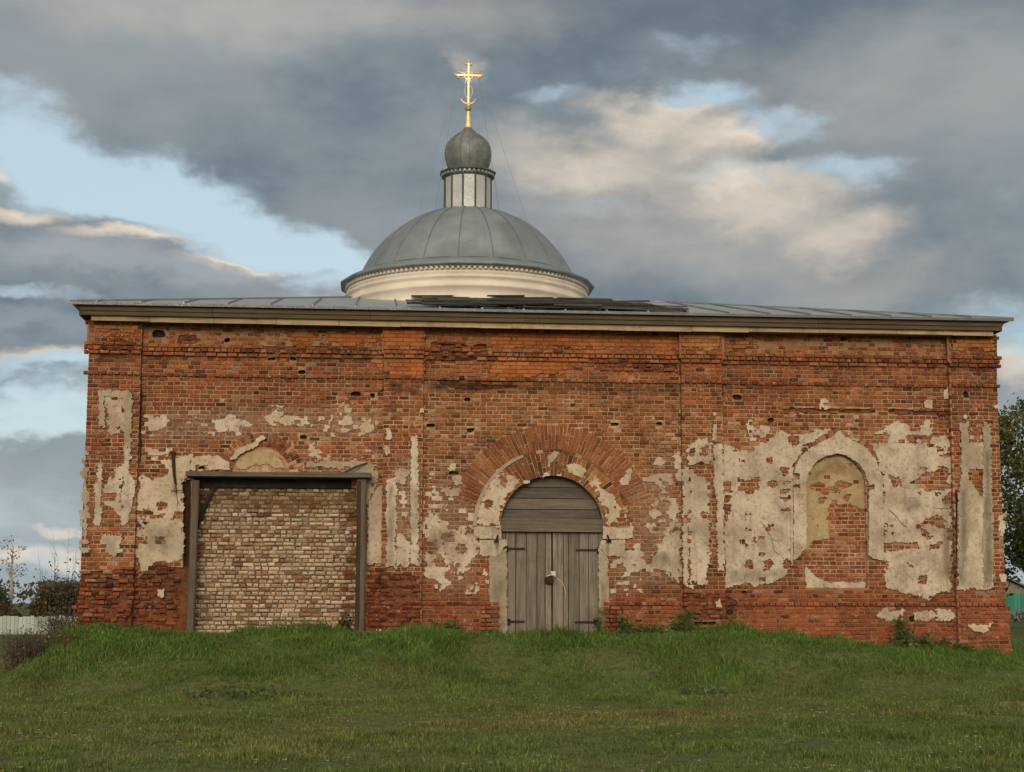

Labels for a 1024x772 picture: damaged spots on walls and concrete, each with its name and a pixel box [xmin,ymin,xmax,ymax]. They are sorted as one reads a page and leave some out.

peeling [72,392,866,632]
peeling [783,388,1007,622]